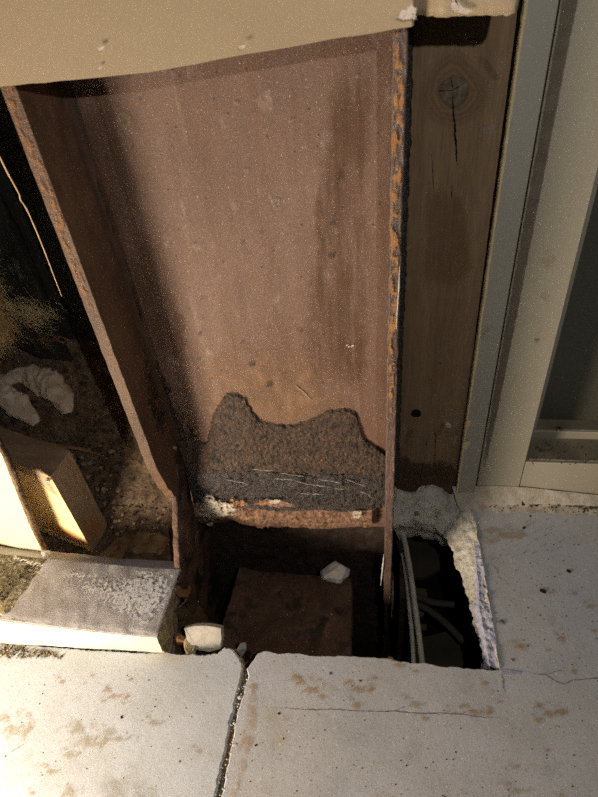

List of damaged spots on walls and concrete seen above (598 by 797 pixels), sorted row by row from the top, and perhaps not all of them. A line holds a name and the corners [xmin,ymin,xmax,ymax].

crack [439,79,464,165]
corrosion [388,29,404,413]
damp [396,458,457,495]
spalling [393,485,501,672]
crack [288,707,501,719]